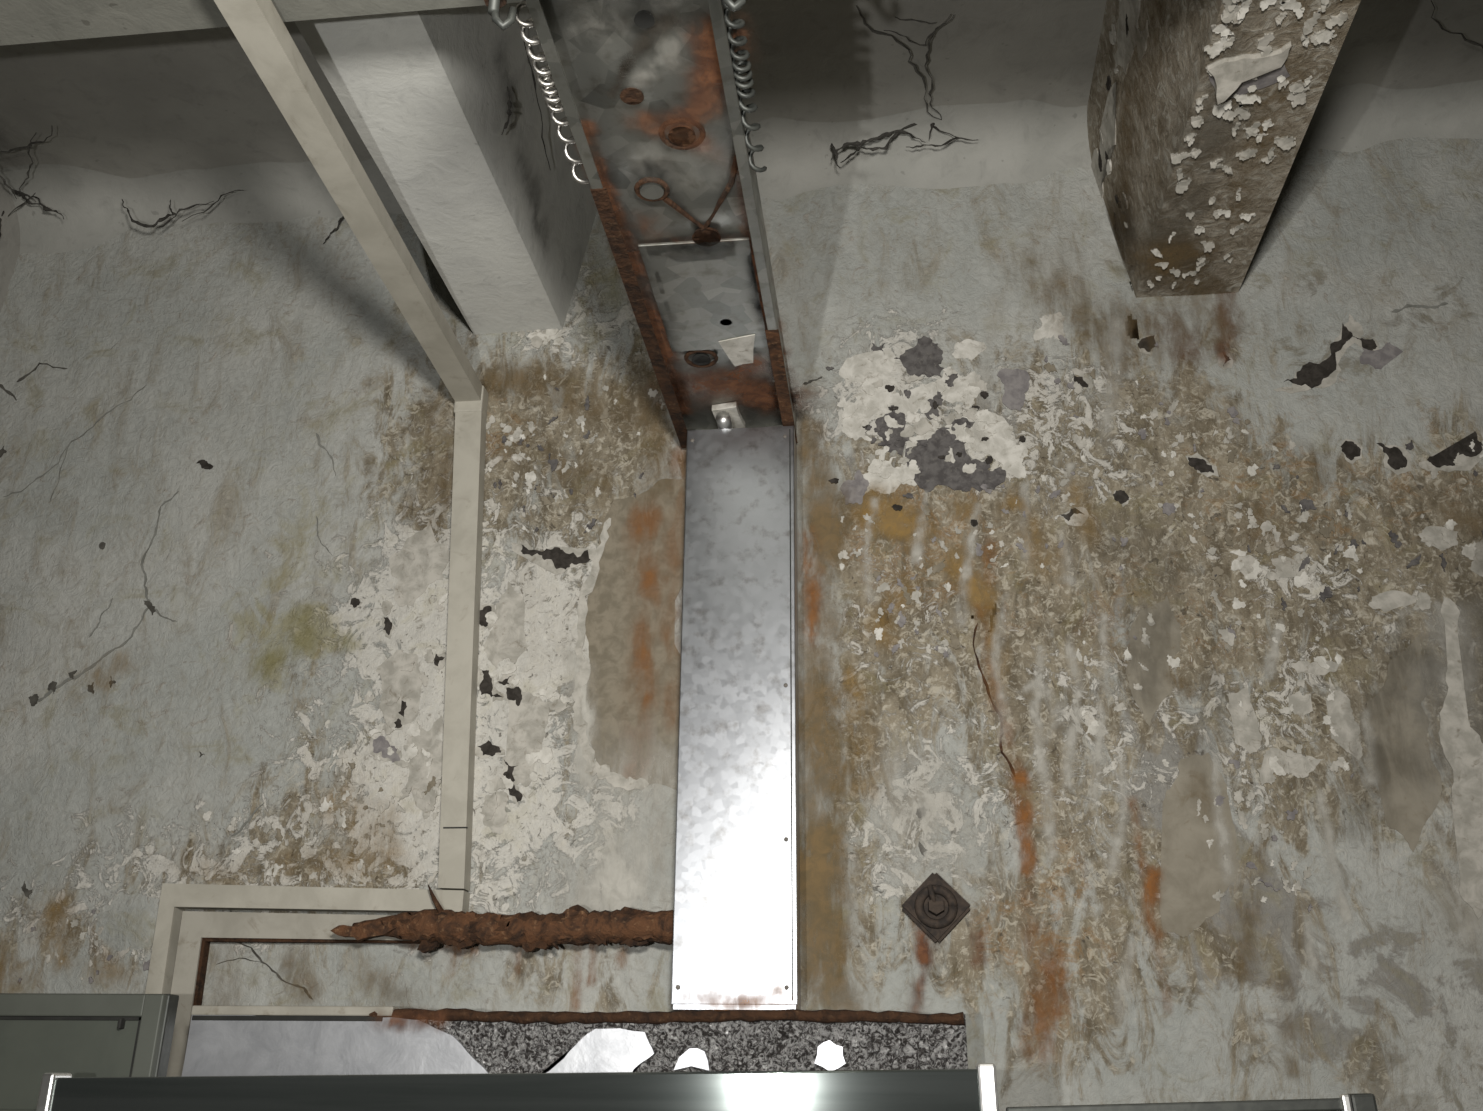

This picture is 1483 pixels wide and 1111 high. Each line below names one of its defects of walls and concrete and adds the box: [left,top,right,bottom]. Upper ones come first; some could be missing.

peeling [1147,0,1348,289]
peeling [1273,314,1403,394]
peeling [826,312,1132,659]
peeling [1340,427,1483,480]
spalling [475,379,686,835]
leakage [962,534,975,580]
corrosion [950,555,995,608]
corrosion [369,417,965,1027]
leakage [1025,648,1050,773]
leakage [1428,596,1483,937]
leakage [578,831,648,912]
corrosion [1016,803,1035,874]